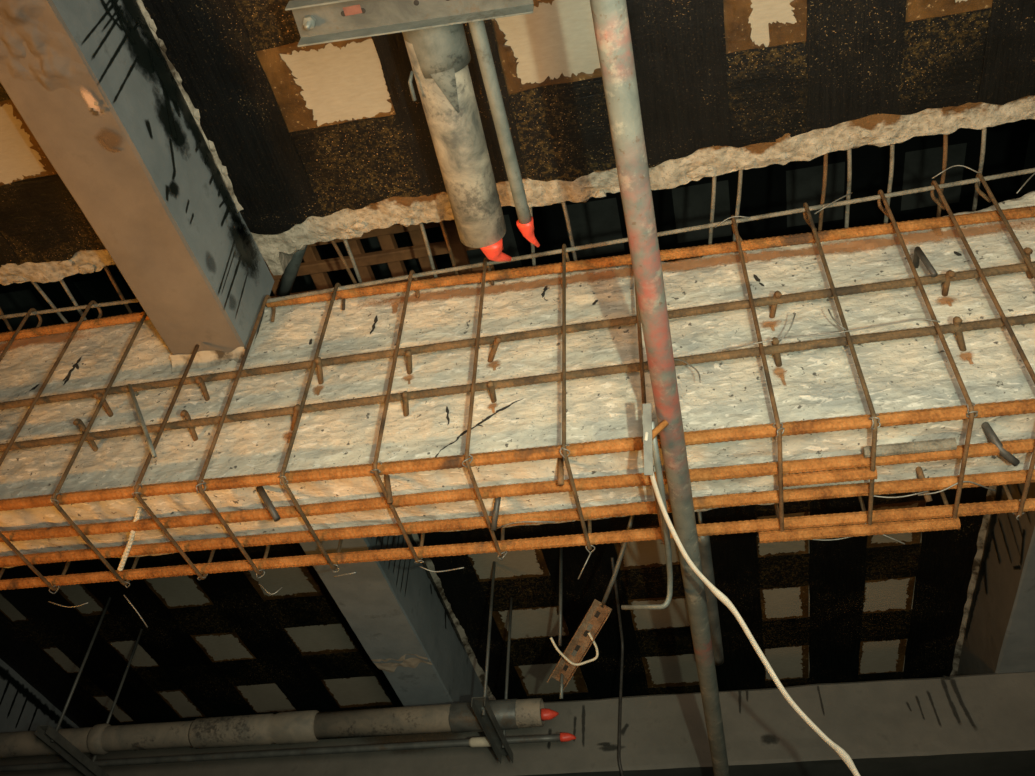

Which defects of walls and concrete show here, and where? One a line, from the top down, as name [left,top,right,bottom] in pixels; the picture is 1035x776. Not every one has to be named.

damp [82,0,258,316]
peeling [136,0,243,212]
spalling [496,168,620,207]
spalling [648,95,1035,190]
spalling [0,249,116,286]
spalling [251,192,454,275]
corrosion [378,267,634,313]
corrosion [661,221,1032,271]
corrosion [0,333,79,353]
spalling [169,347,245,372]
peeling [299,538,433,672]
peeling [950,485,997,677]